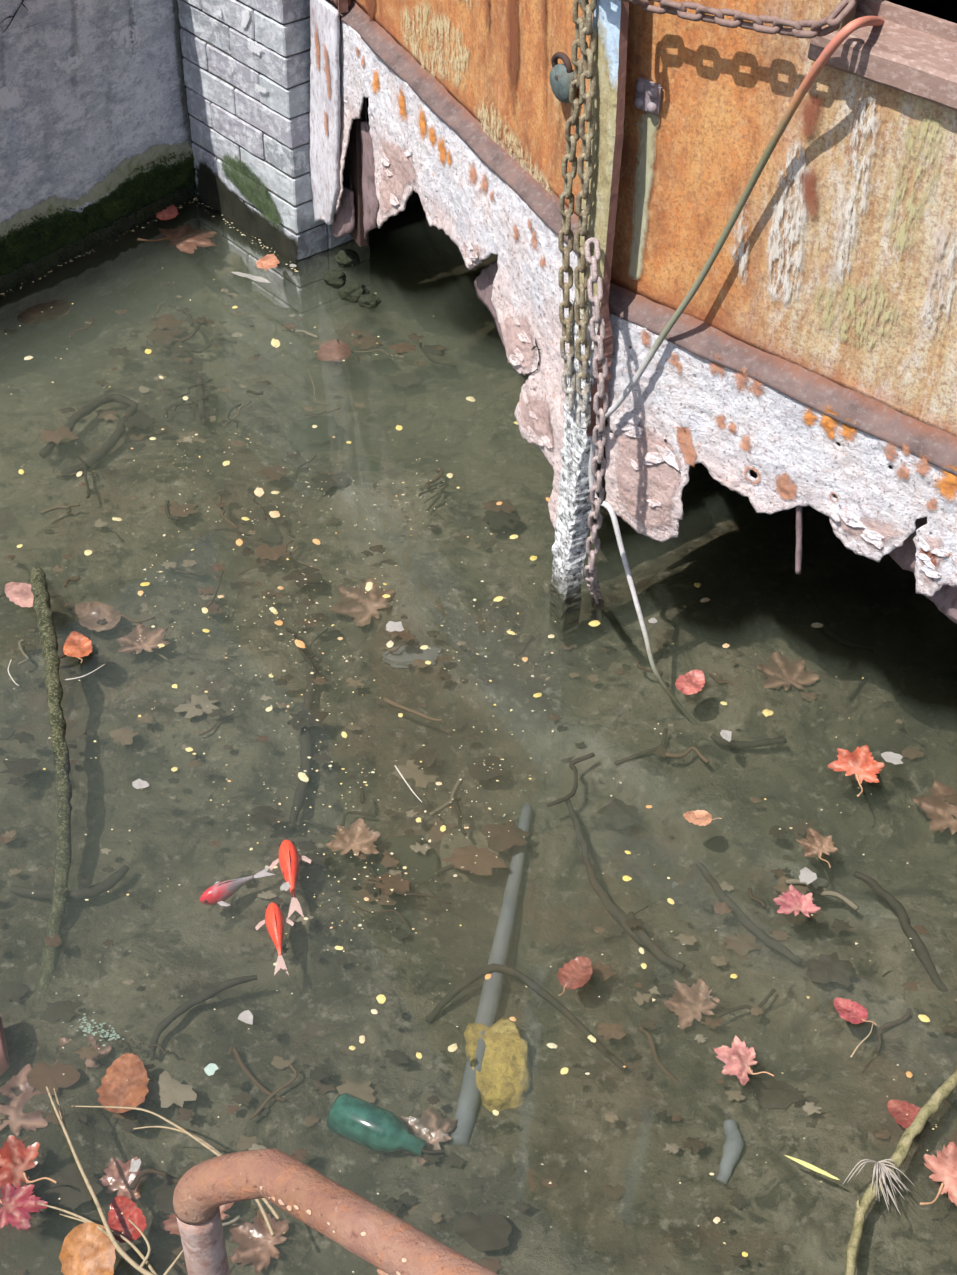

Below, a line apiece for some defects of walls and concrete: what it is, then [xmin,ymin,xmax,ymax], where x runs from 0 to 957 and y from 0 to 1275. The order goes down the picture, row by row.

peeling [401,3,469,87]
corrosion [507,0,519,110]
corrosion [398,90,451,165]
peeling [478,101,552,195]
corrosion [803,169,817,215]
damp [0,162,298,308]
peeling [509,318,531,366]
peeling [631,439,679,471]
corrosion [716,415,751,452]
corrosion [803,407,857,440]
peeling [824,492,884,549]
peeling [916,537,950,578]